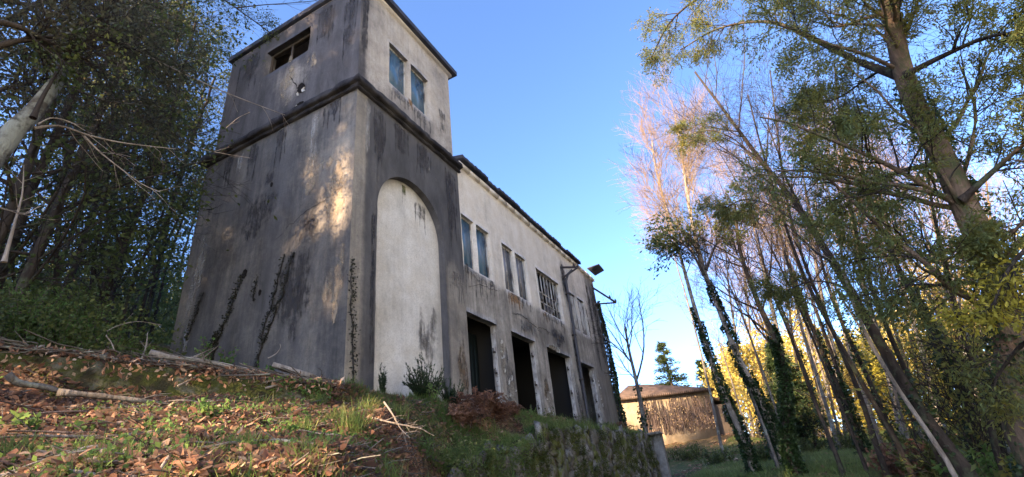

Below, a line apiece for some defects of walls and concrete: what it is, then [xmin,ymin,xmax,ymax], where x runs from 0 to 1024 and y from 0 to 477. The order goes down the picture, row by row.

damp [316,0,369,59]
damp [300,214,316,238]
damp [420,309,436,363]